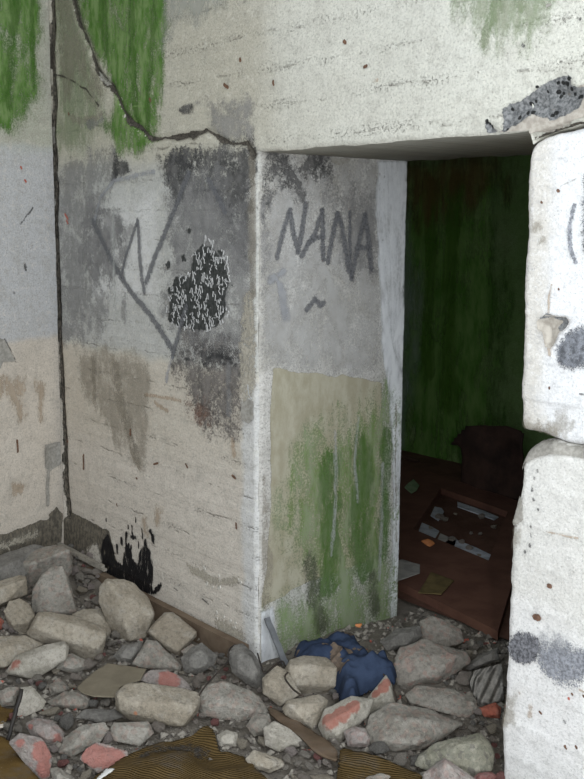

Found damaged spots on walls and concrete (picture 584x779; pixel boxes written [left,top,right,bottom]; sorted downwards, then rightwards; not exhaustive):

spalling [485,75,584,133]
crack [49,0,257,518]
spalling [536,284,569,356]
water stain [304,553,329,633]